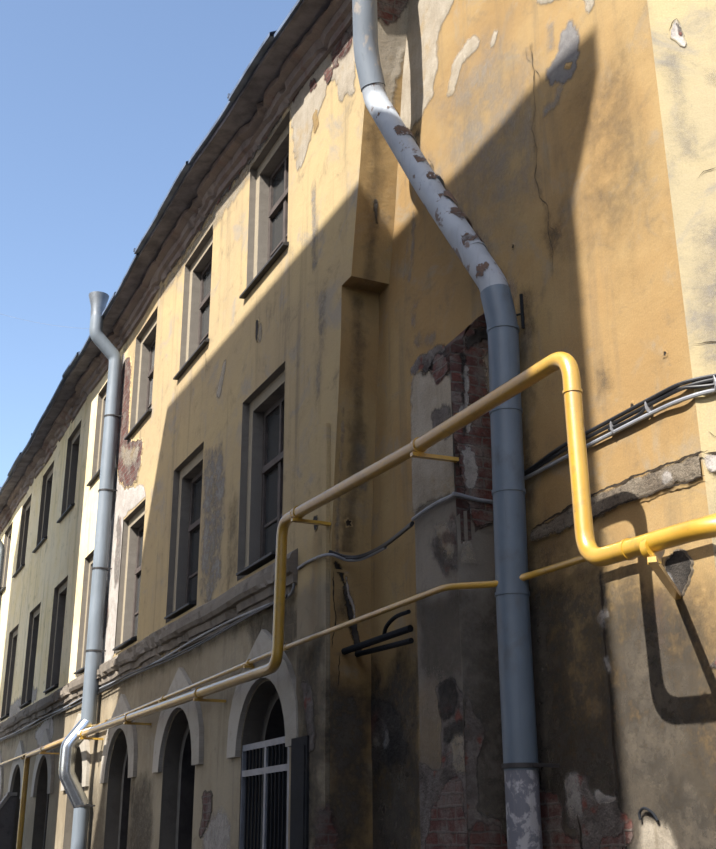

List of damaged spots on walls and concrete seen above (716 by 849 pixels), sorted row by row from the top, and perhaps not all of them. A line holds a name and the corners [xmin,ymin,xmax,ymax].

flaking render [377,0,454,130]
flaking render [161,22,355,294]
crack [526,46,555,268]
flaking render [100,354,146,665]
crack [332,561,362,685]
flaking render [410,326,490,441]
flaking render [411,412,493,526]
spalling [665,549,694,597]
leakage [299,644,420,849]
spalling [419,677,508,849]
leakage [461,610,506,825]
flaking render [539,773,676,849]